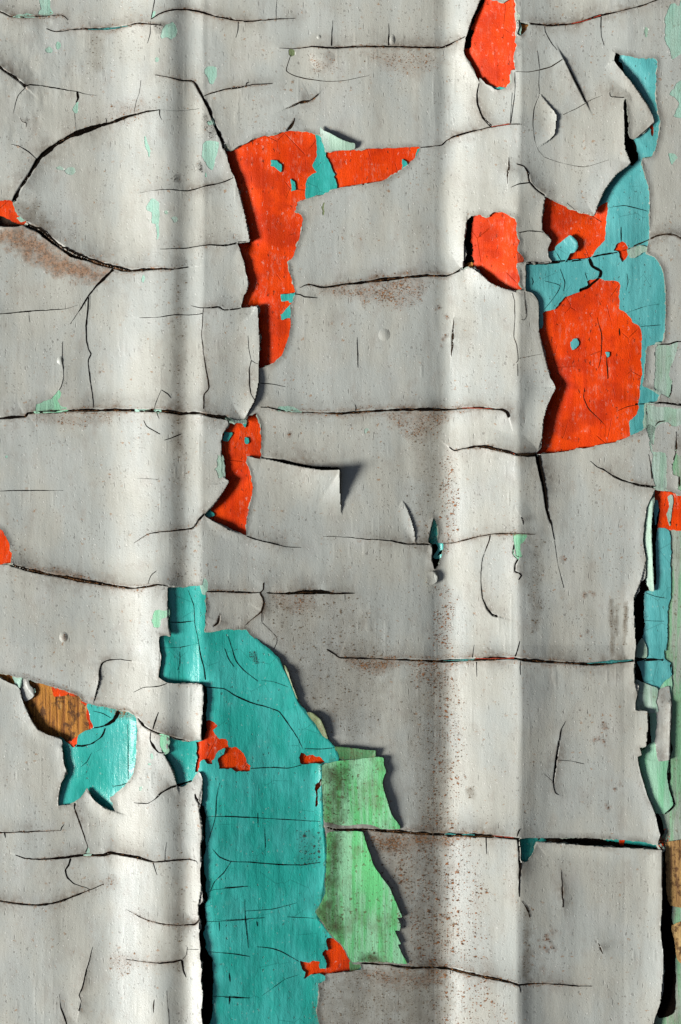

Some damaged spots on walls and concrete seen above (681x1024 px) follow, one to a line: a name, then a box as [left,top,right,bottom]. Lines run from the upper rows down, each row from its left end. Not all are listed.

peeling [464,0,529,90]
rust [0,225,104,283]
crack [0,21,467,440]
peeling [202,127,420,372]
crack [420,0,681,379]
peeling [205,412,262,535]
crack [324,444,564,617]
peeling [461,53,681,1024]
crack [11,564,354,769]
crack [326,641,673,676]
peeling [0,579,407,1024]
crack [0,780,530,1002]